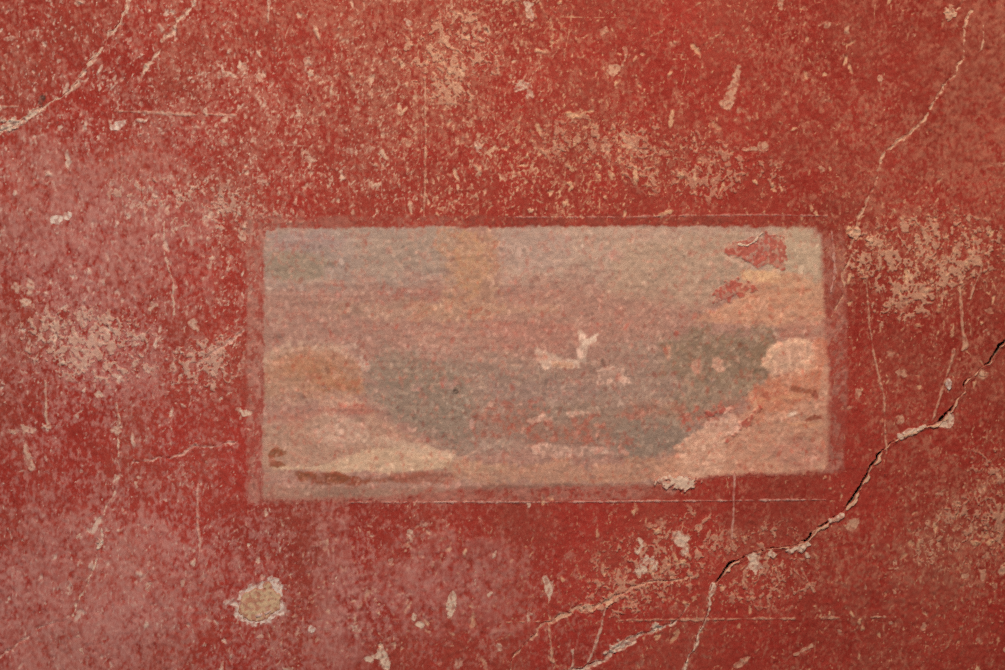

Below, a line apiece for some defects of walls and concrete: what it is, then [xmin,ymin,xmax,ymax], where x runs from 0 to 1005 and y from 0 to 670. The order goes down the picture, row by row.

crack [0,0,132,138]
crack [139,0,197,83]
crack [508,336,1005,670]
spalling [222,575,290,639]